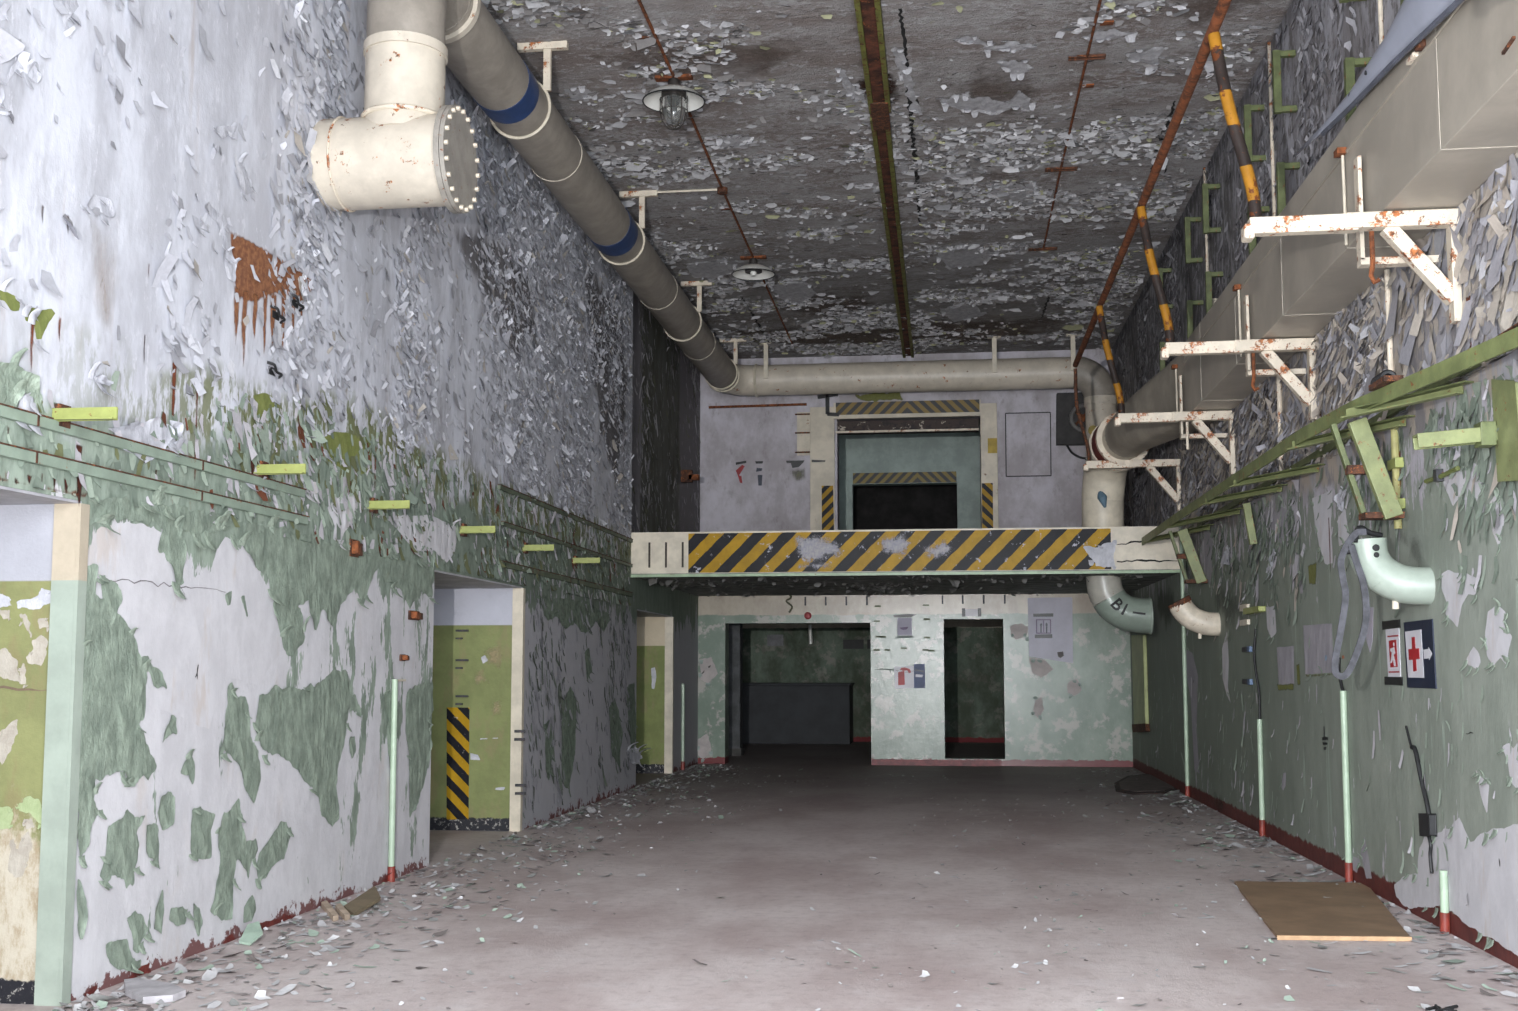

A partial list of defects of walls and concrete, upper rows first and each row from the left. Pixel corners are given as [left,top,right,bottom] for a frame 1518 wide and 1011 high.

corrosion [231,233,311,362]
peeling [0,0,701,979]
peeling [481,0,1378,401]
peeling [648,152,1518,956]